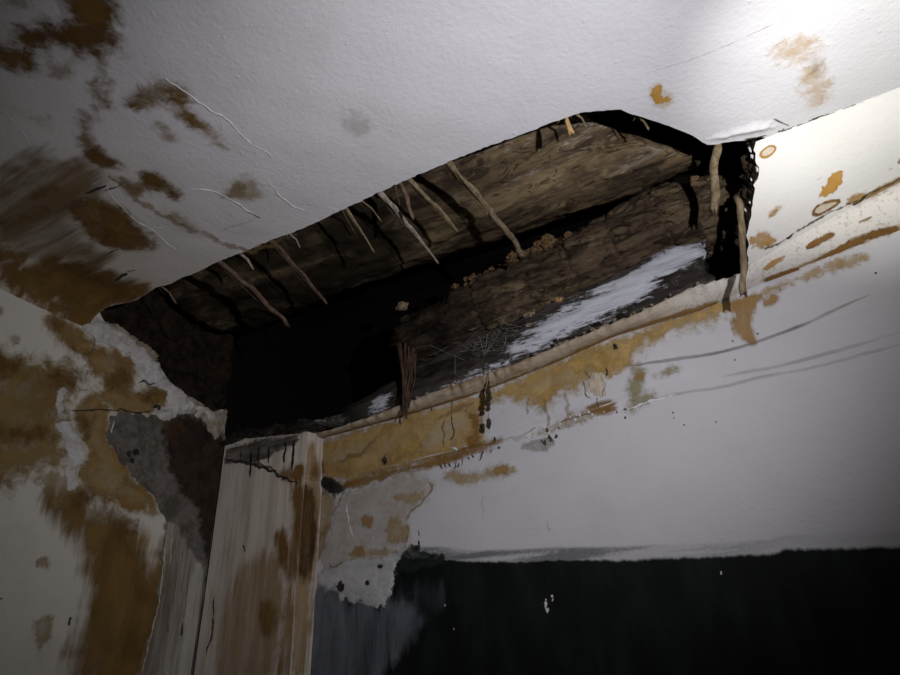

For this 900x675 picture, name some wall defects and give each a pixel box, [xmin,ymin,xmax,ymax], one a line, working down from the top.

water stain [0,0,117,73]
water stain [129,85,205,129]
crack [165,78,272,158]
crack [55,184,174,248]
crack [190,189,259,218]
flaking render [731,138,759,261]
peeling [55,387,87,491]
water stain [0,120,168,675]
crack [73,407,152,415]
flaking render [83,318,228,675]
water stain [292,226,900,675]
peeling [312,463,433,675]